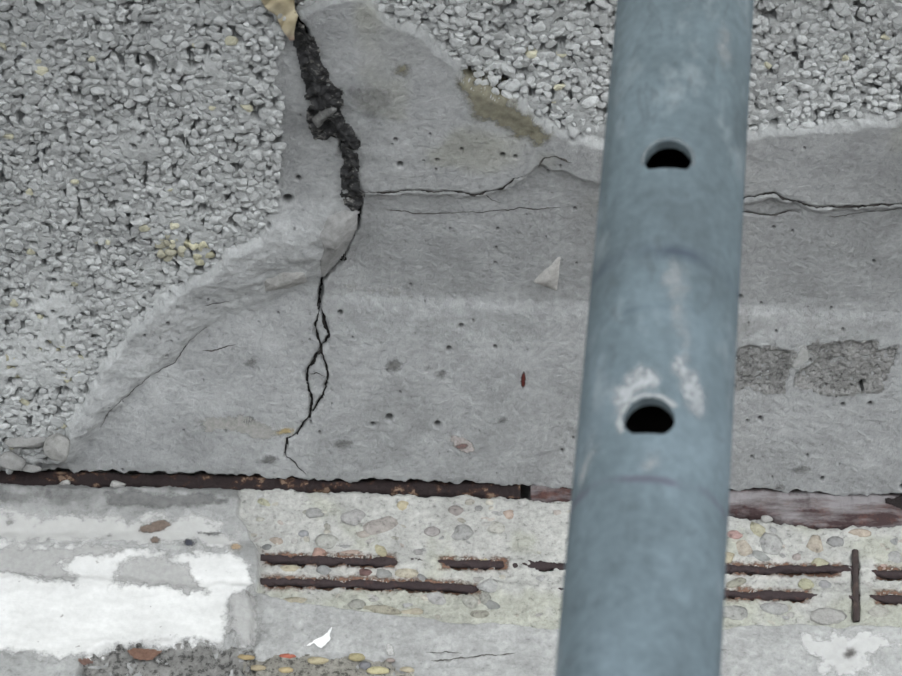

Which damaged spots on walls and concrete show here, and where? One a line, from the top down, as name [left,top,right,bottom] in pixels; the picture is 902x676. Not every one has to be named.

crack [743,192,898,217]
crack [284,277,330,474]
damp [105,488,226,507]
rust [0,470,572,503]
rust [728,487,902,530]
damp [139,520,171,543]
spalling [260,554,398,568]
spalling [260,578,479,594]
rust [262,550,509,596]
spalling [438,559,565,572]
rust [724,561,843,603]
spalling [726,564,860,575]